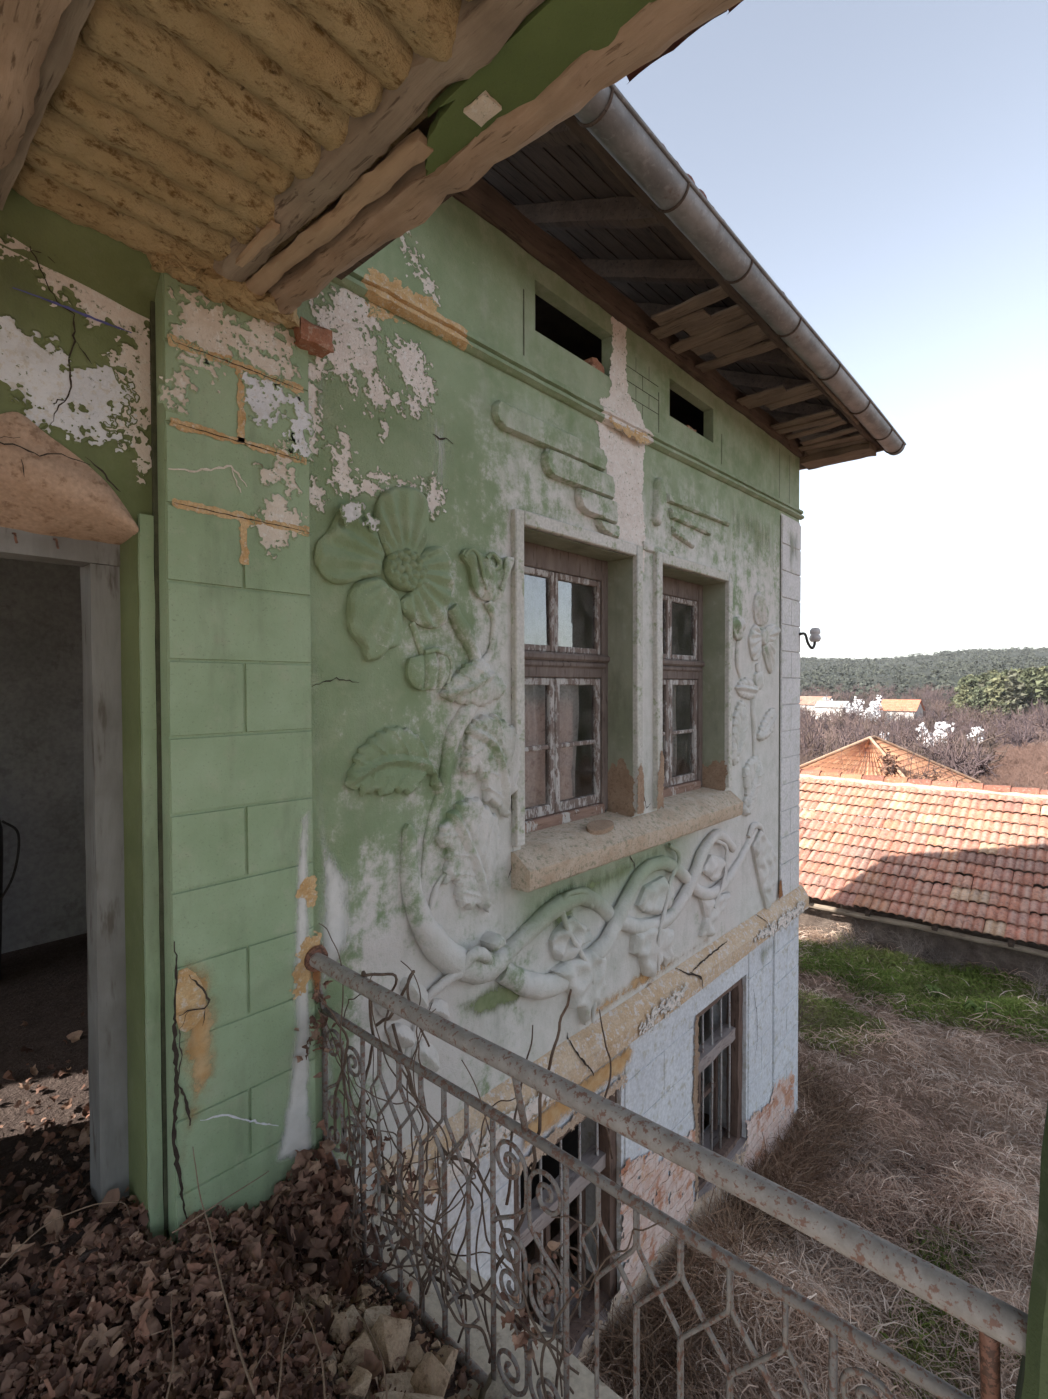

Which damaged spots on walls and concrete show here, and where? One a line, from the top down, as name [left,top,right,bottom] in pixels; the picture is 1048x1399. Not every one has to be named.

crack [0,246,121,492]
peeling [0,226,473,561]
flaking render [596,316,654,572]
crack [172,941,278,1219]
flaking render [289,931,322,1000]
flaking render [295,875,318,909]
crack [675,941,727,986]
flaking render [578,1175,736,1369]